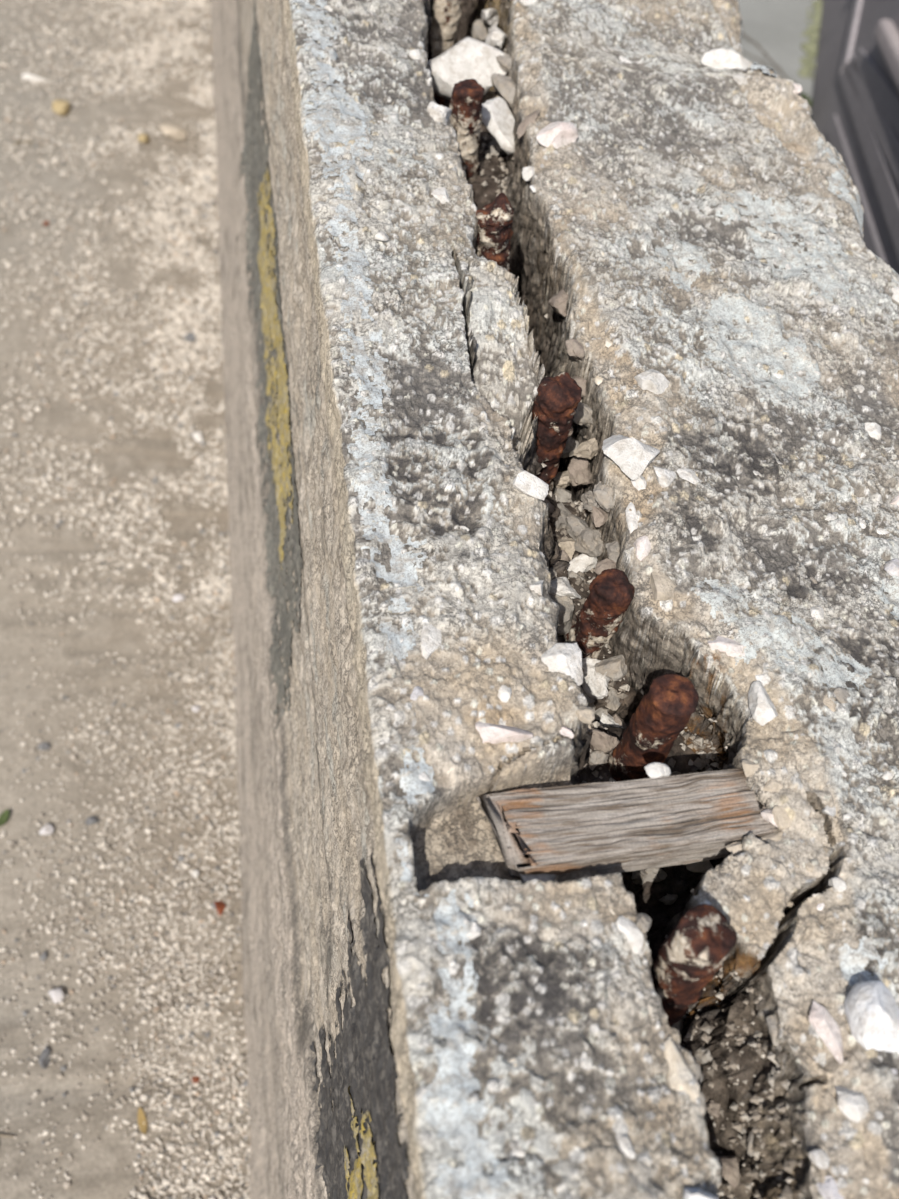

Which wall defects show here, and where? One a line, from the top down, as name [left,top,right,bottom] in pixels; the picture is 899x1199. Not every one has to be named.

peeling [239,0,303,730]
spalling [291,0,574,805]
spalling [532,372,582,493]
crack [423,0,760,802]
peeling [653,238,712,292]
peeling [712,189,851,301]
spalling [564,568,635,659]
spalling [607,673,699,782]
peeling [310,849,410,1199]
peeling [393,838,637,1199]
crack [621,838,743,969]
crack [680,791,847,1199]